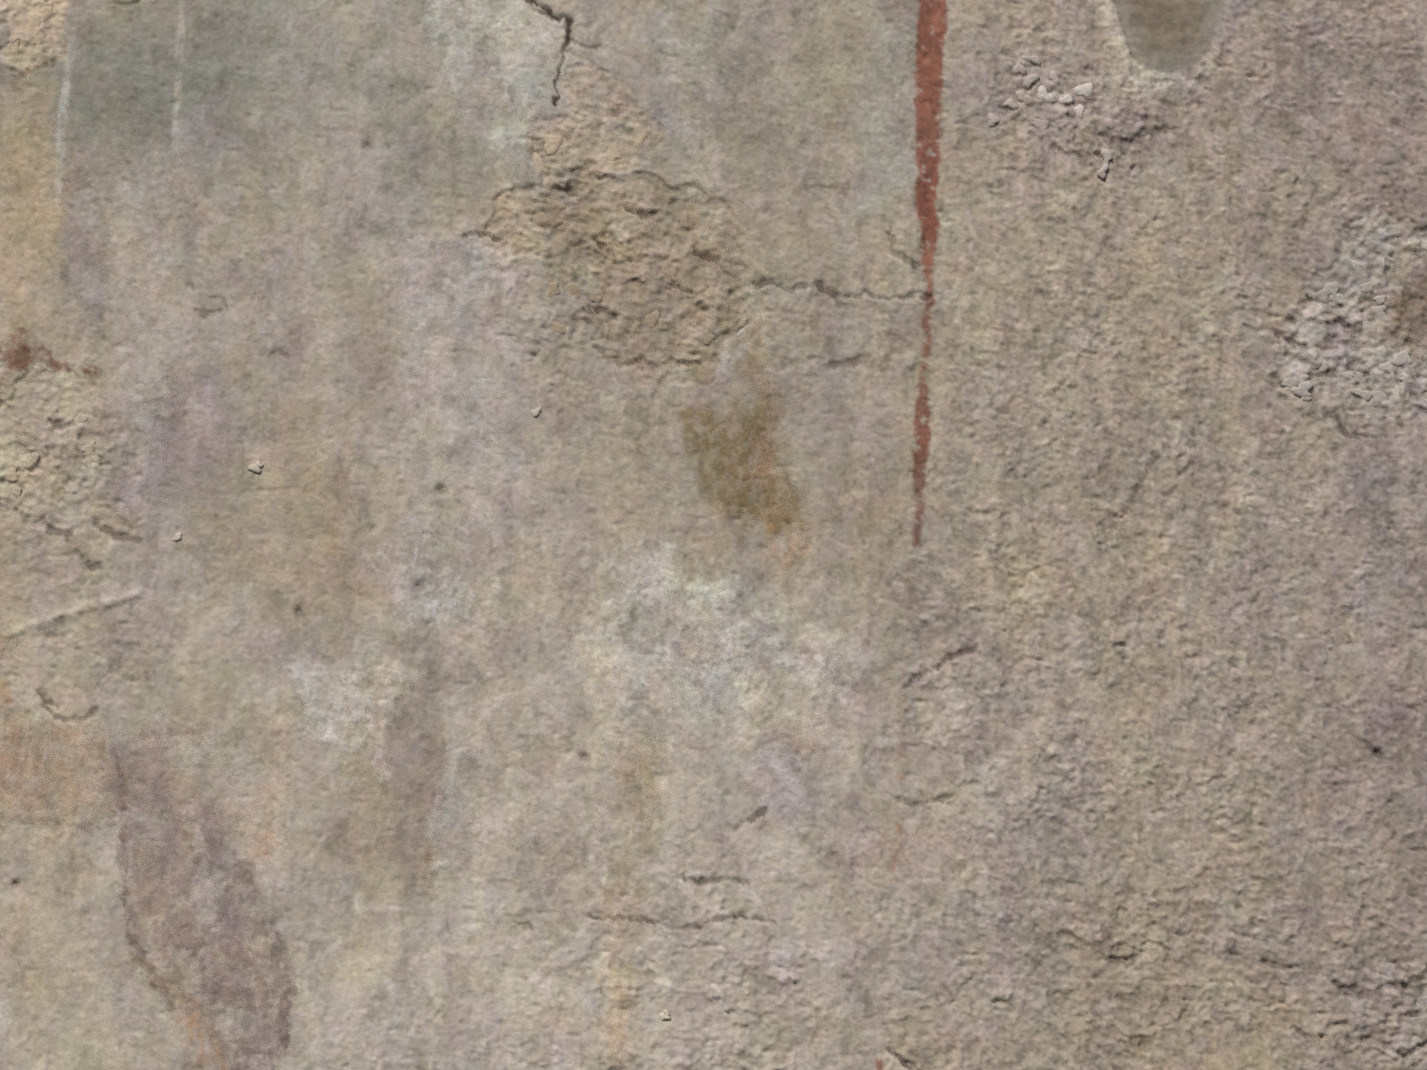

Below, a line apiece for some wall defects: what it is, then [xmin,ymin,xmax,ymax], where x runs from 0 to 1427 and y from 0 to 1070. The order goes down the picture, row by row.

flaking render [0,0,67,73]
crack [526,0,573,106]
flaking render [530,198,632,315]
peeling [668,314,761,373]
leakage [681,401,800,531]